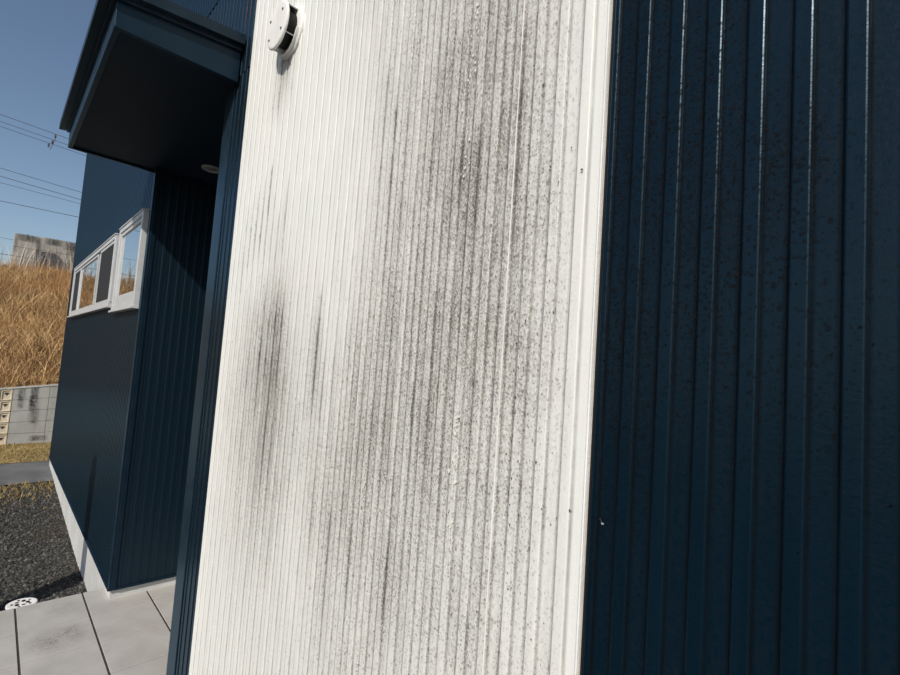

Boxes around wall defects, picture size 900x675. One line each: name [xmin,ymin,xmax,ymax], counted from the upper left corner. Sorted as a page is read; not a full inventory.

damp [232,0,566,675]